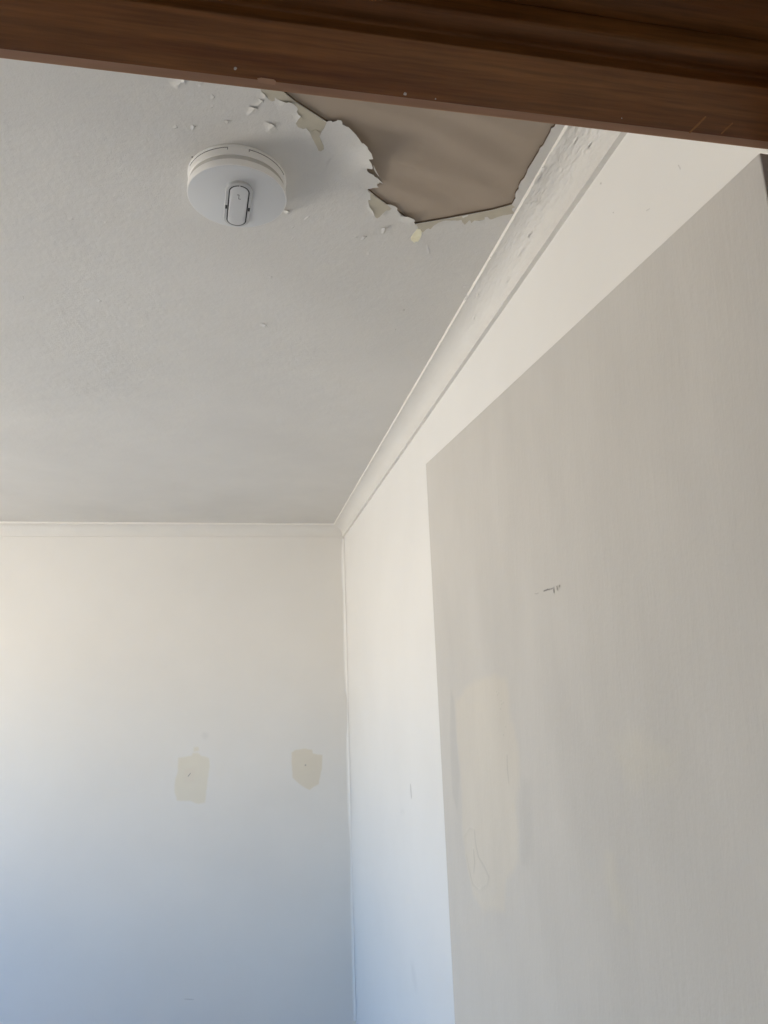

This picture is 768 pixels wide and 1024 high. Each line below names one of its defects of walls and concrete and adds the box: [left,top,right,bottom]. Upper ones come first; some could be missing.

peeling [256,89,517,243]